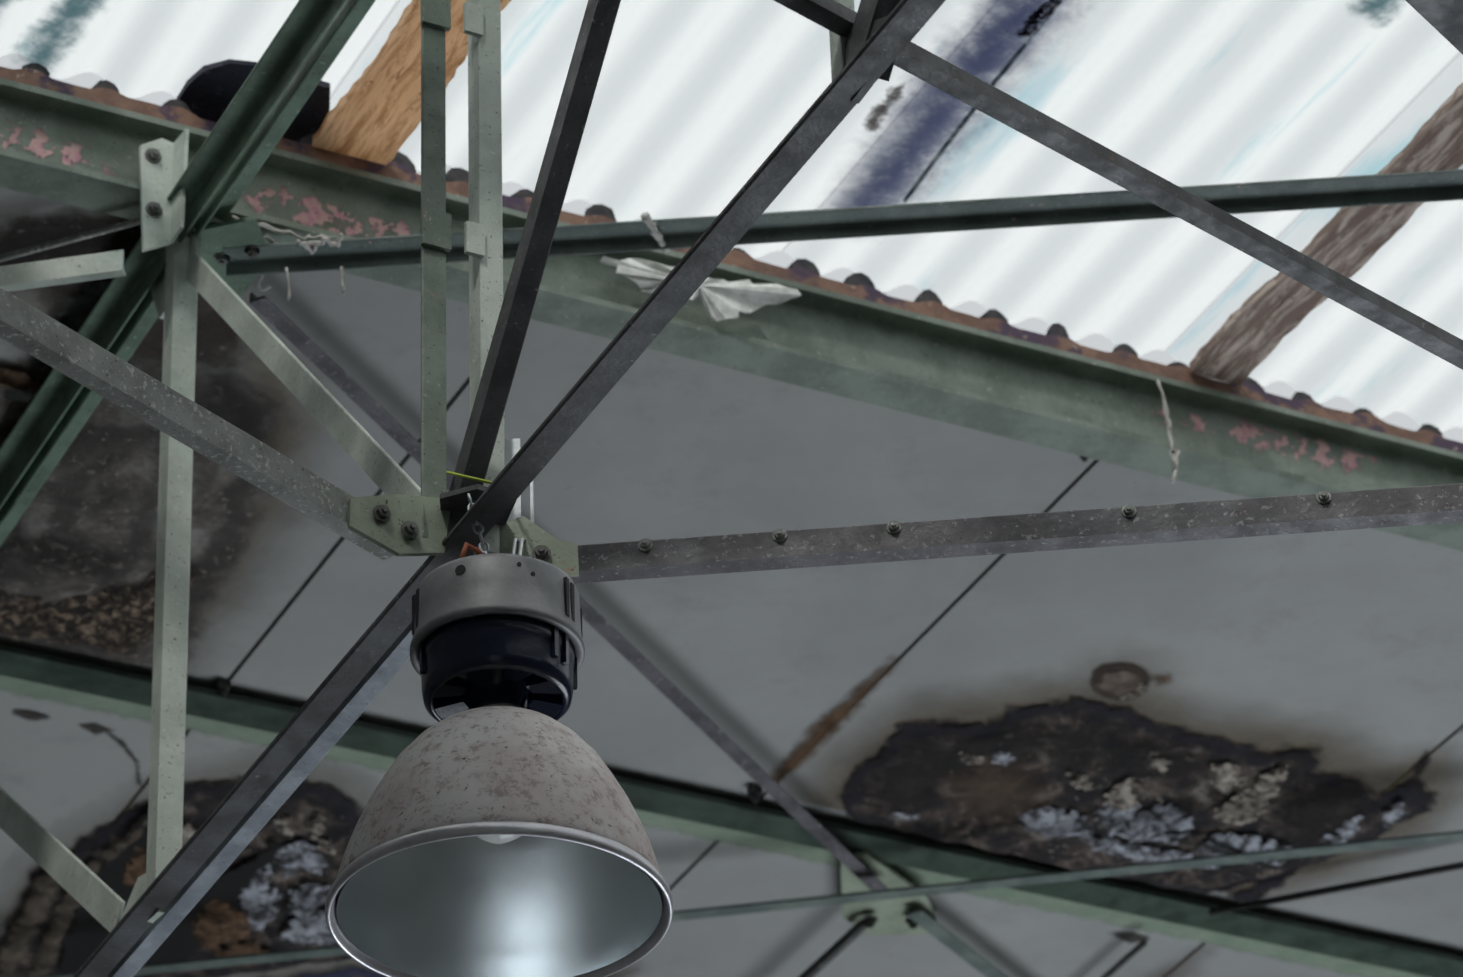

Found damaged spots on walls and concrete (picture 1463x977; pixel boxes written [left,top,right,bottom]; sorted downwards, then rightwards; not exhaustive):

damp [0,214,141,266]
peeling [245,187,412,237]
damp [43,278,113,332]
damp [128,317,164,363]
damp [196,292,238,368]
damp [1091,663,1169,701]
rust [774,668,890,781]
peeling [821,697,1437,902]
peeling [72,802,148,912]
peeling [133,781,362,977]
peeling [0,867,110,977]
damp [297,966,387,977]